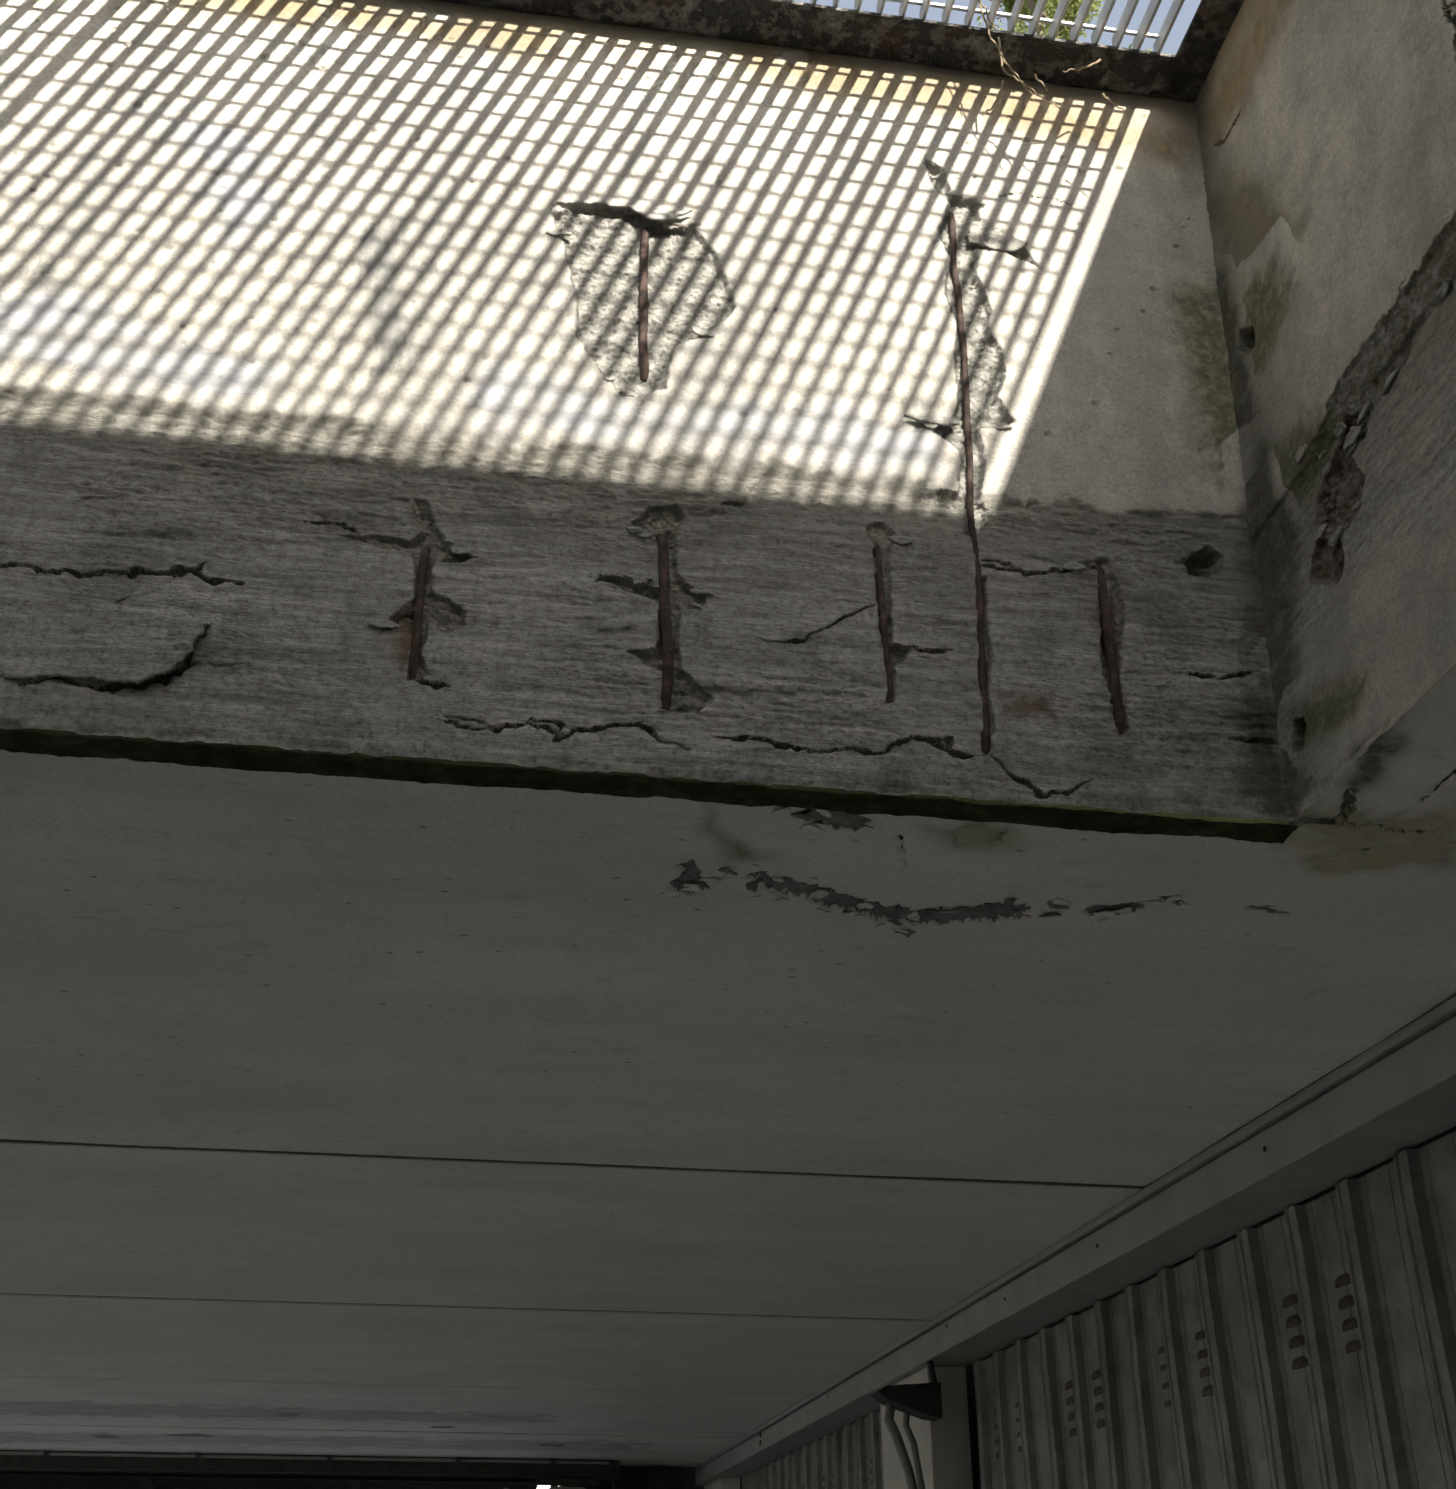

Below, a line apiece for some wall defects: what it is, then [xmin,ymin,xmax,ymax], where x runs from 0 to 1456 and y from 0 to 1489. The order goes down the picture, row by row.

spalling [546,196,736,397]
spalling [900,159,1041,757]
spalling [1295,210,1456,587]
peeling [0,598,207,685]
crack [0,626,243,694]
crack [0,562,245,602]
spalling [336,499,479,685]
crack [417,680,682,746]
spalling [592,503,716,713]
spalling [865,522,912,705]
crack [717,735,1088,799]
peeling [661,859,1187,938]